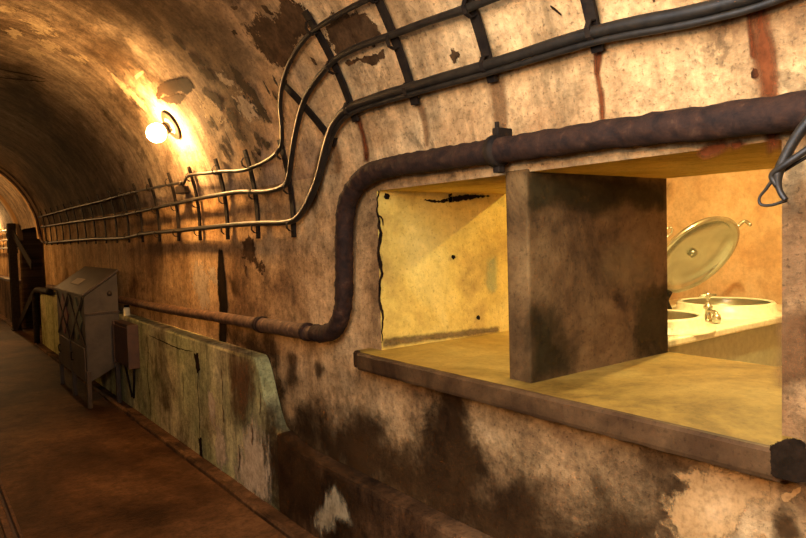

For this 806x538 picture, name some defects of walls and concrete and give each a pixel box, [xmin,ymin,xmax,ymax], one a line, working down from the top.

peeling [0,5,93,64]
peeling [106,68,148,112]
peeling [156,33,272,170]
spalling [231,0,311,73]
spalling [324,9,385,66]
rust [417,103,428,143]
rust [491,82,506,128]
rust [594,51,605,120]
rust [747,9,777,97]
damp [226,327,691,538]
peeling [315,488,350,535]
peeling [661,438,806,538]